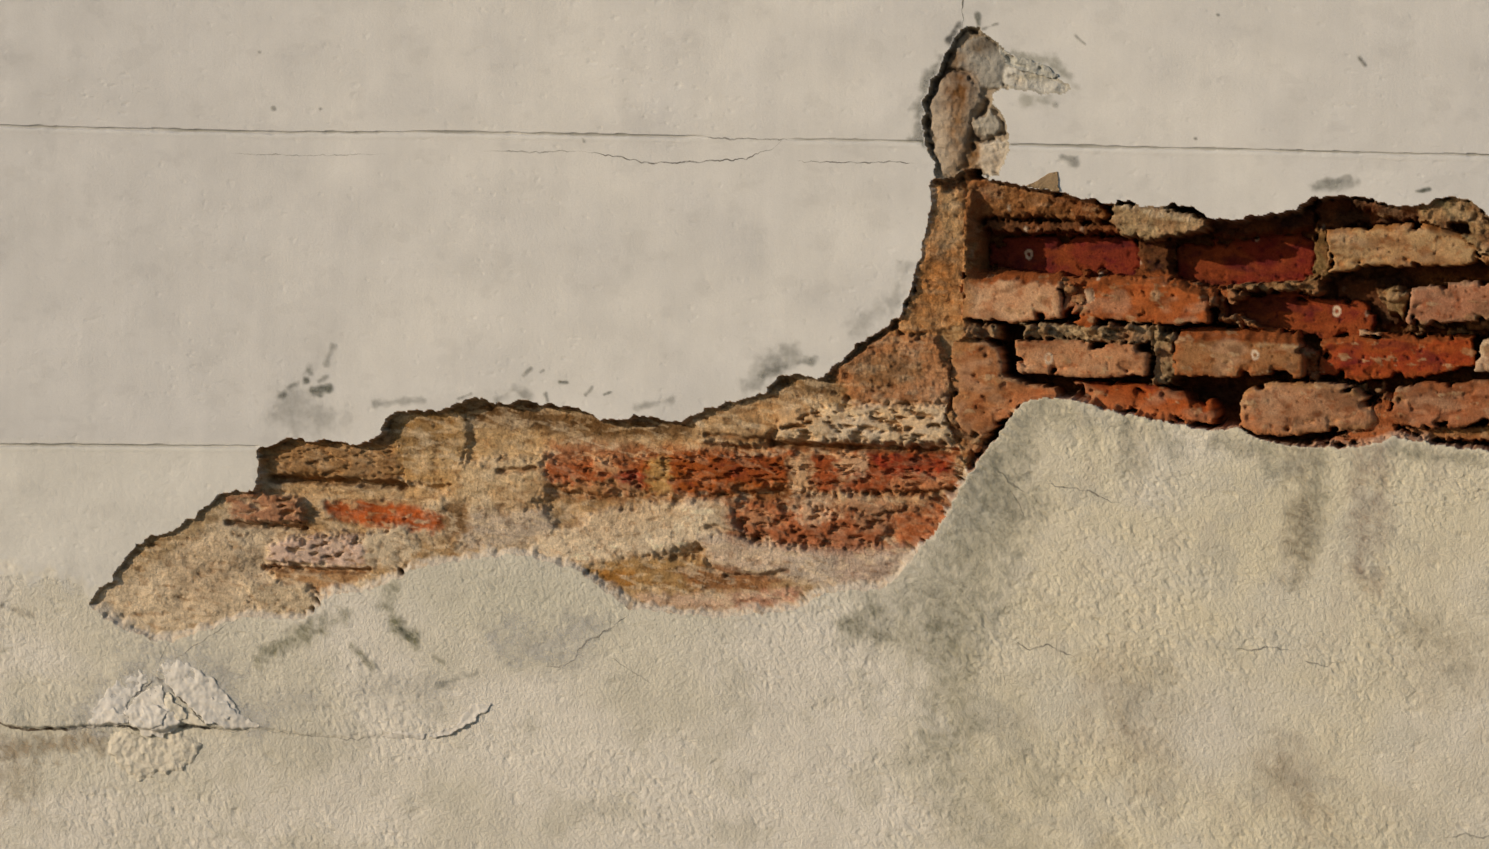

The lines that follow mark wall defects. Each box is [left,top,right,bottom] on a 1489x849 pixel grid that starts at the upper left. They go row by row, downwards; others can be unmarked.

flaking render [89,26,1489,643]
crack [0,656,211,735]